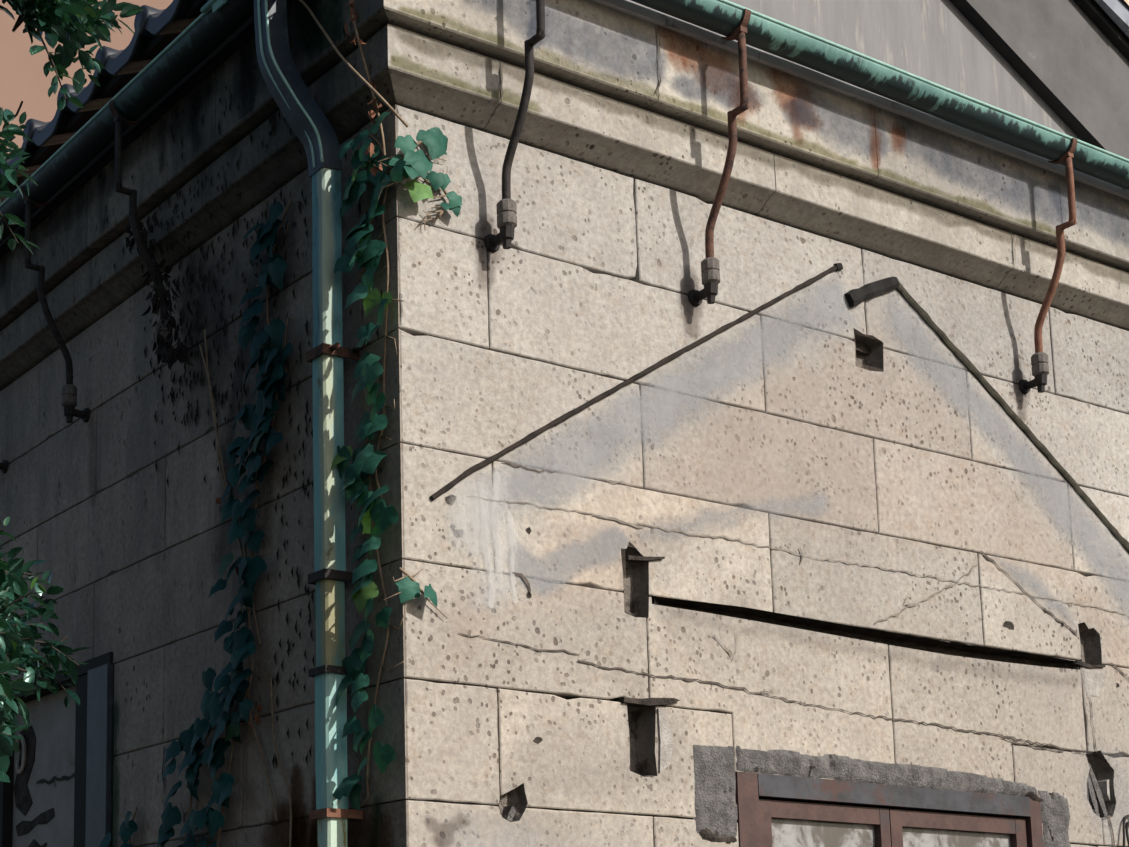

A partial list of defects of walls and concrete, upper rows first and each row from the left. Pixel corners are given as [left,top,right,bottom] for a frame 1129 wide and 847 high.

crack [502,461,557,473]
damp [453,279,851,608]
crack [467,496,1129,635]
crack [459,629,1097,755]